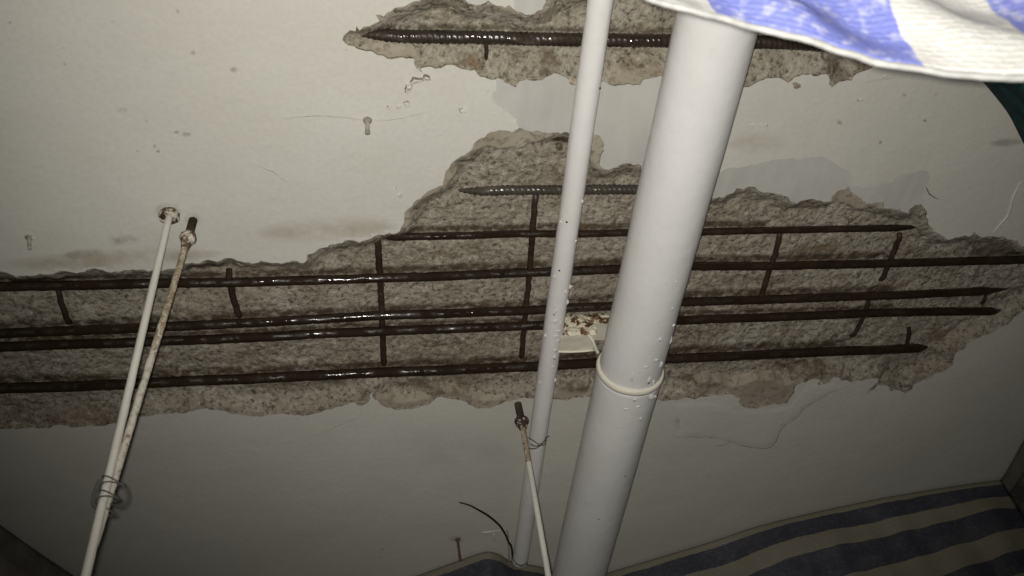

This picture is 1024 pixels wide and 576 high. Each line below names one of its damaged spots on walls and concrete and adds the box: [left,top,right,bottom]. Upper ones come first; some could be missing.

spalling [743,32,873,89]
spalling [0,0,587,429]
corrosion [386,224,557,238]
spalling [553,0,676,401]
corrosion [236,261,547,276]
corrosion [694,246,889,262]
spalling [656,156,1024,409]
corrosion [0,299,547,341]
corrosion [0,356,536,394]
corrosion [559,351,602,359]
corrosion [668,340,843,377]